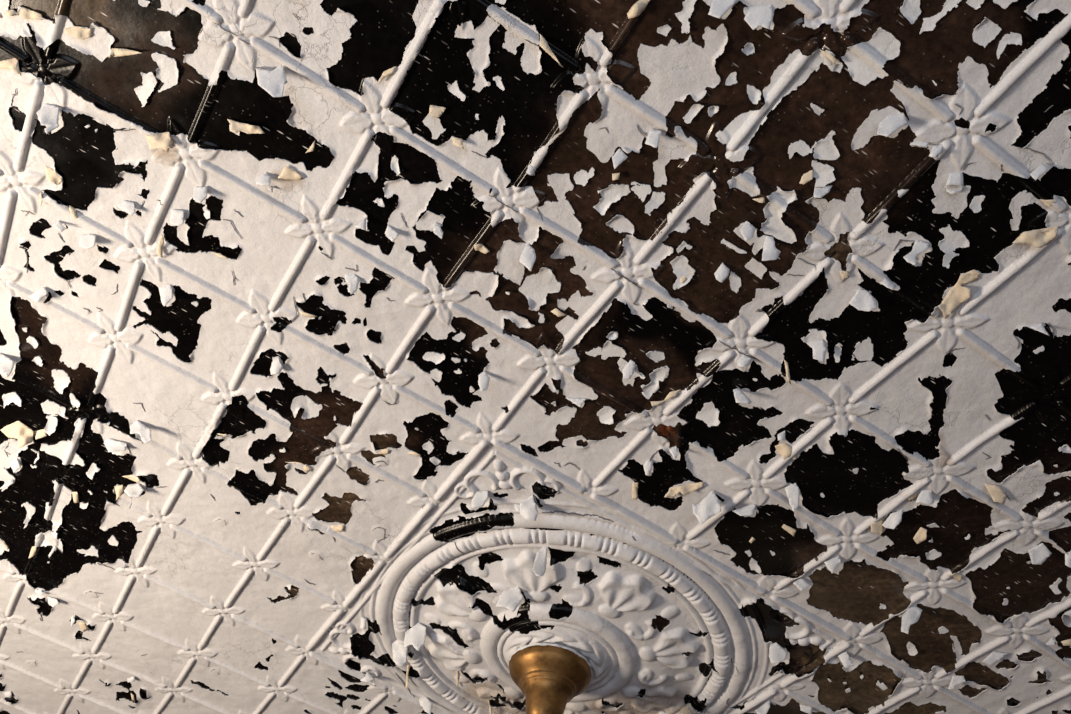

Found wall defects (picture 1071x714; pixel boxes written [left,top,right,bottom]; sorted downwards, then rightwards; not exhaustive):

peeling [0,0,335,271]
peeling [133,279,212,362]
peeling [271,267,395,354]
peeling [312,0,1071,714]
peeling [0,234,159,616]
peeling [200,349,363,506]
peeling [269,585,300,603]
peeling [0,674,18,714]
peeling [106,677,151,709]
peeling [255,638,277,670]